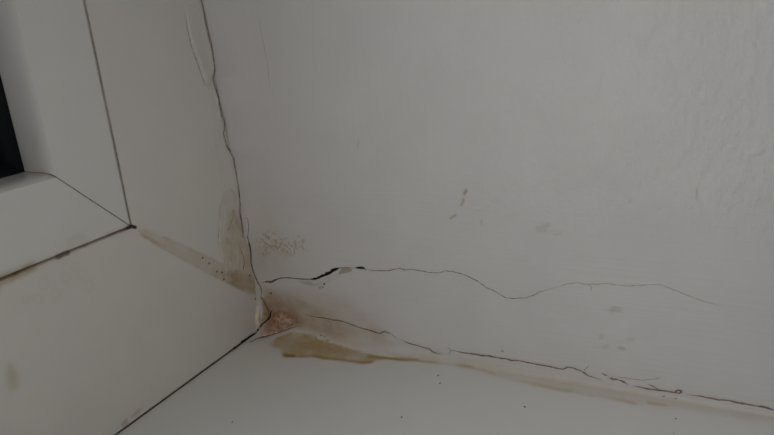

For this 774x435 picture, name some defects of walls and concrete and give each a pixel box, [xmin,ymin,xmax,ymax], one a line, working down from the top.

crack [199,0,725,308]
crack [305,315,774,413]